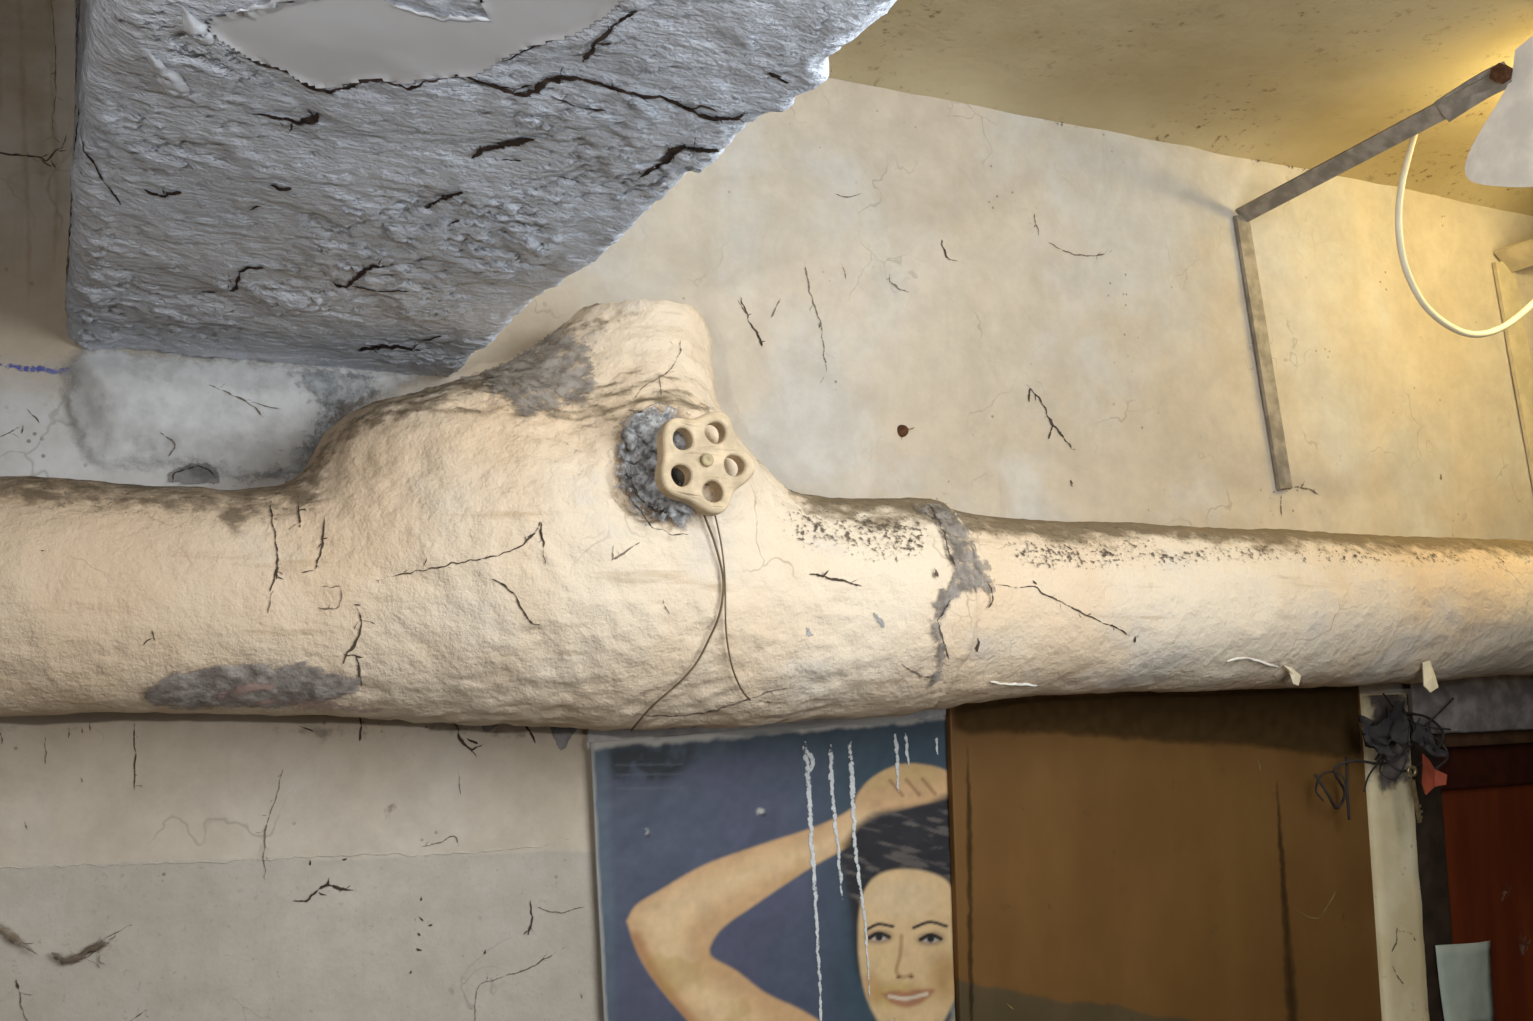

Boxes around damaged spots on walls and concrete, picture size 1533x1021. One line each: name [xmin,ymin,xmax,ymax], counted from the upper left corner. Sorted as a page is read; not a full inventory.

spalling [207,0,623,88]
crack [0,0,181,205]
crack [218,10,748,179]
crack [425,138,534,226]
crack [64,203,72,302]
water stain [455,319,604,417]
crack [16,980,30,1021]